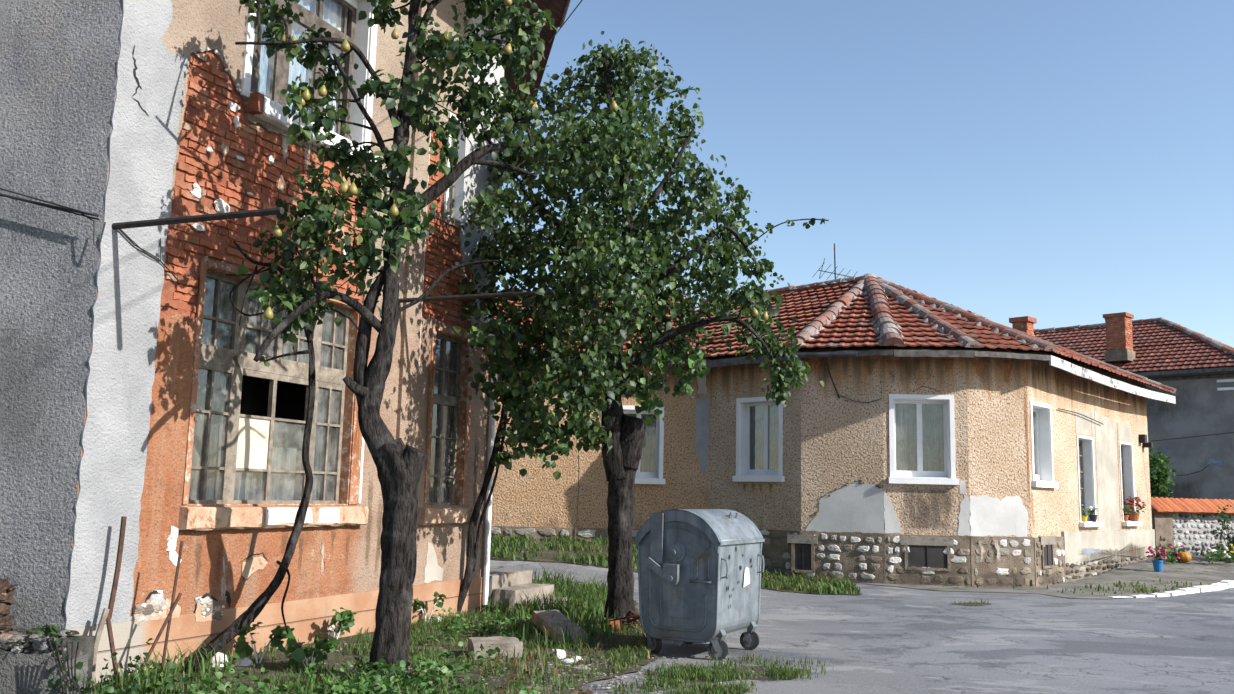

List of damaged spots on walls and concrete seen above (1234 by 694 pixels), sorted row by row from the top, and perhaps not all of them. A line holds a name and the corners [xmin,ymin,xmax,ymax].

crack [133,45,149,116]
flaking render [160,48,367,319]
flaking render [422,128,473,329]
flaking render [166,526,182,566]
flaking render [240,553,268,580]
flaking render [130,590,225,626]